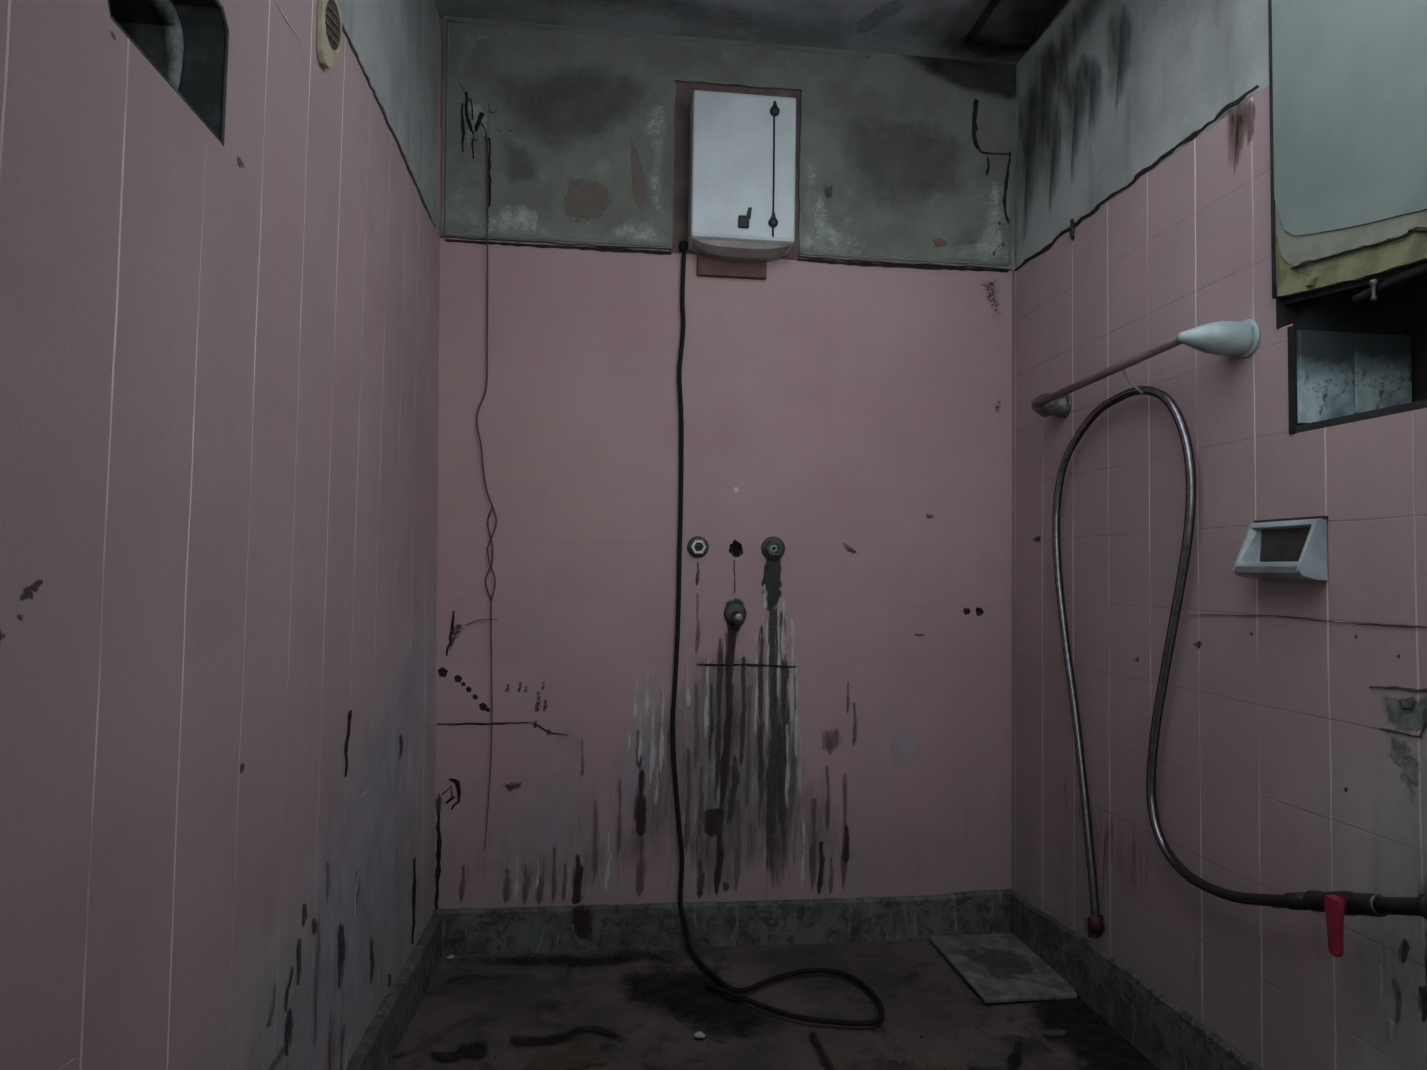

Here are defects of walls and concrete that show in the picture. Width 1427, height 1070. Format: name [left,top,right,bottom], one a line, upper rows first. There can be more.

water stain [442,195,552,235]
water stain [801,164,858,254]
water stain [949,182,1014,261]
crack [798,85,1259,272]
water stain [1020,63,1096,213]
water stain [628,671,665,813]
water stain [684,558,857,894]
spalling [1369,686,1427,786]
water stain [1378,938,1409,1040]
water stain [1419,956,1427,1021]